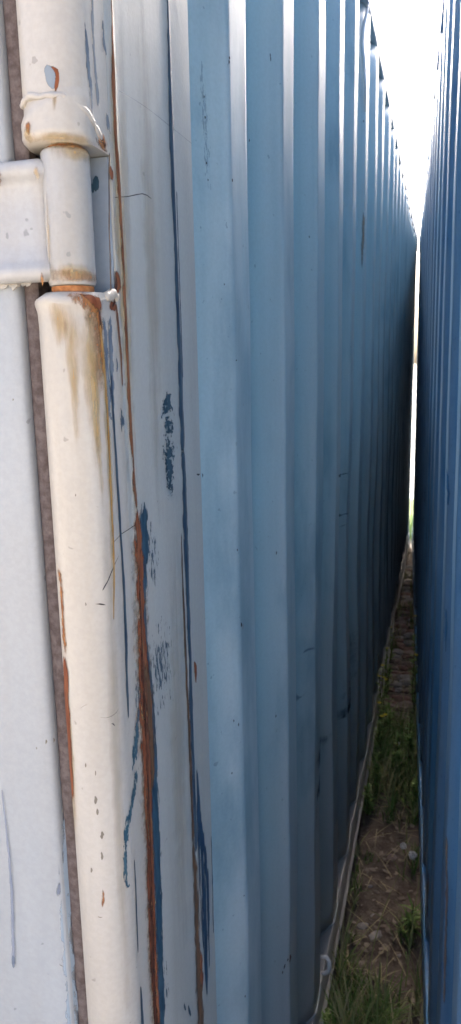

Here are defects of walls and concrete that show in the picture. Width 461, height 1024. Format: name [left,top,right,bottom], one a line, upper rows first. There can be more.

peeling [44,65,59,91]
corrosion [48,136,84,156]
corrosion [62,267,93,281]
corrosion [68,0,160,1024]
corrosion [58,571,74,799]
peeling [123,616,172,887]